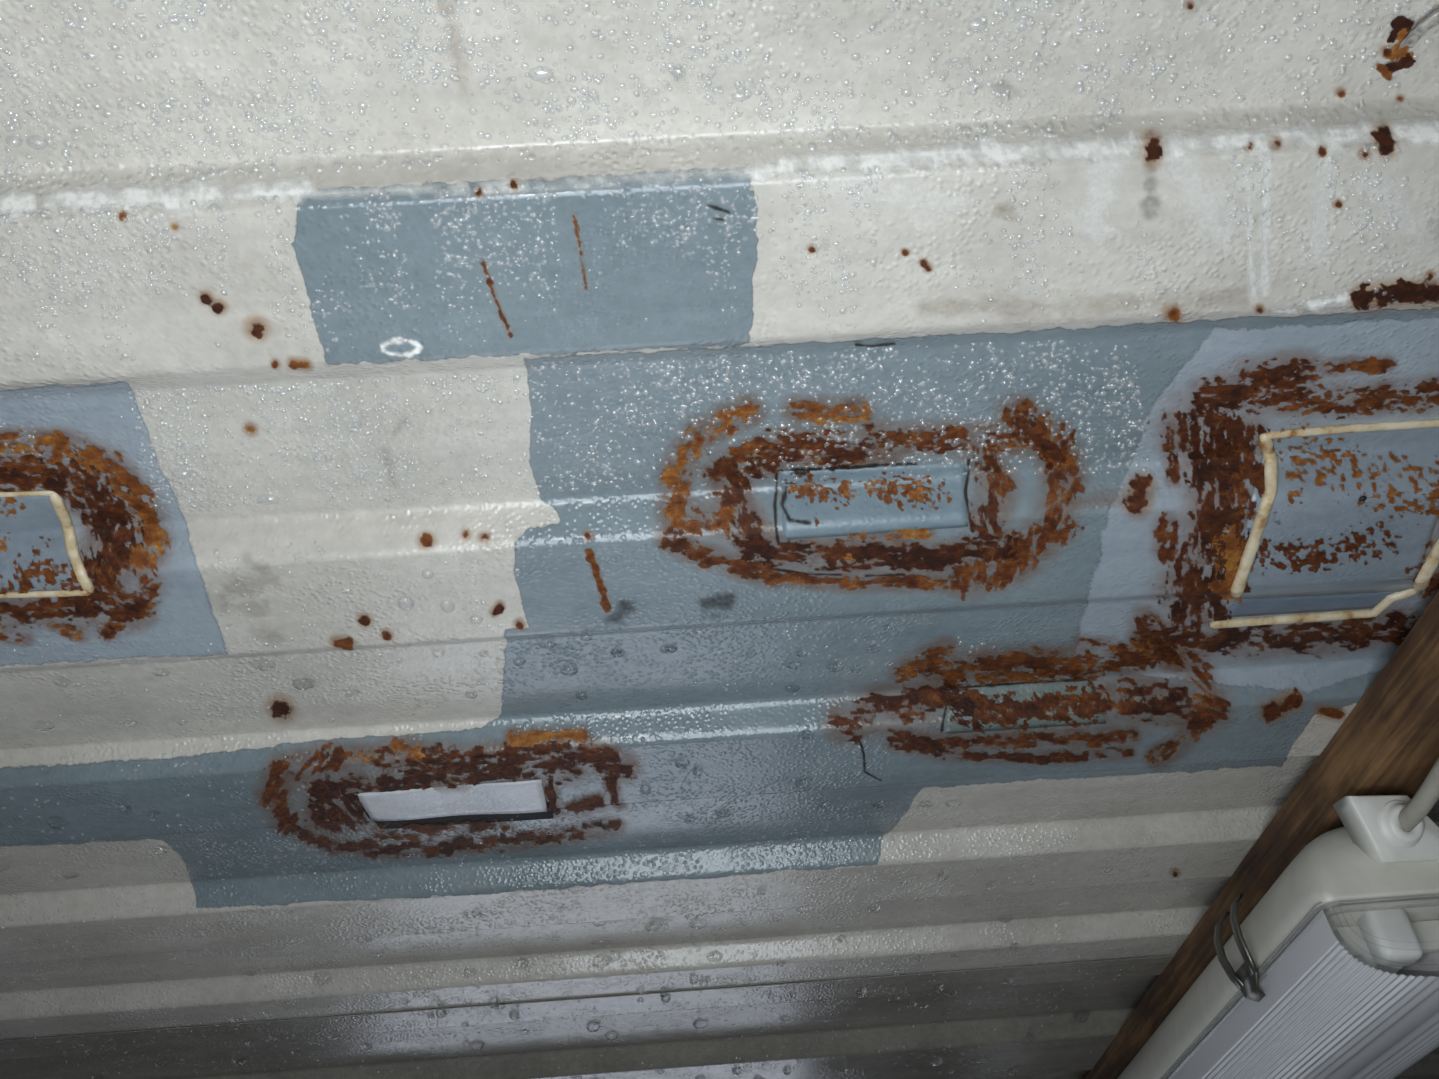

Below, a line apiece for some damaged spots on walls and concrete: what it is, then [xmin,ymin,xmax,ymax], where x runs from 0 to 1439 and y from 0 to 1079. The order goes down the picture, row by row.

corrosion [1363,126,1395,157]
corrosion [200,295,224,314]
corrosion [1350,274,1439,311]
corrosion [251,324,265,339]
corrosion [272,361,309,370]
corrosion [658,398,1085,601]
corrosion [0,430,170,642]
corrosion [585,532,611,613]
corrosion [828,356,1439,765]
corrosion [334,638,353,651]
corrosion [358,616,391,640]
corrosion [262,729,637,860]